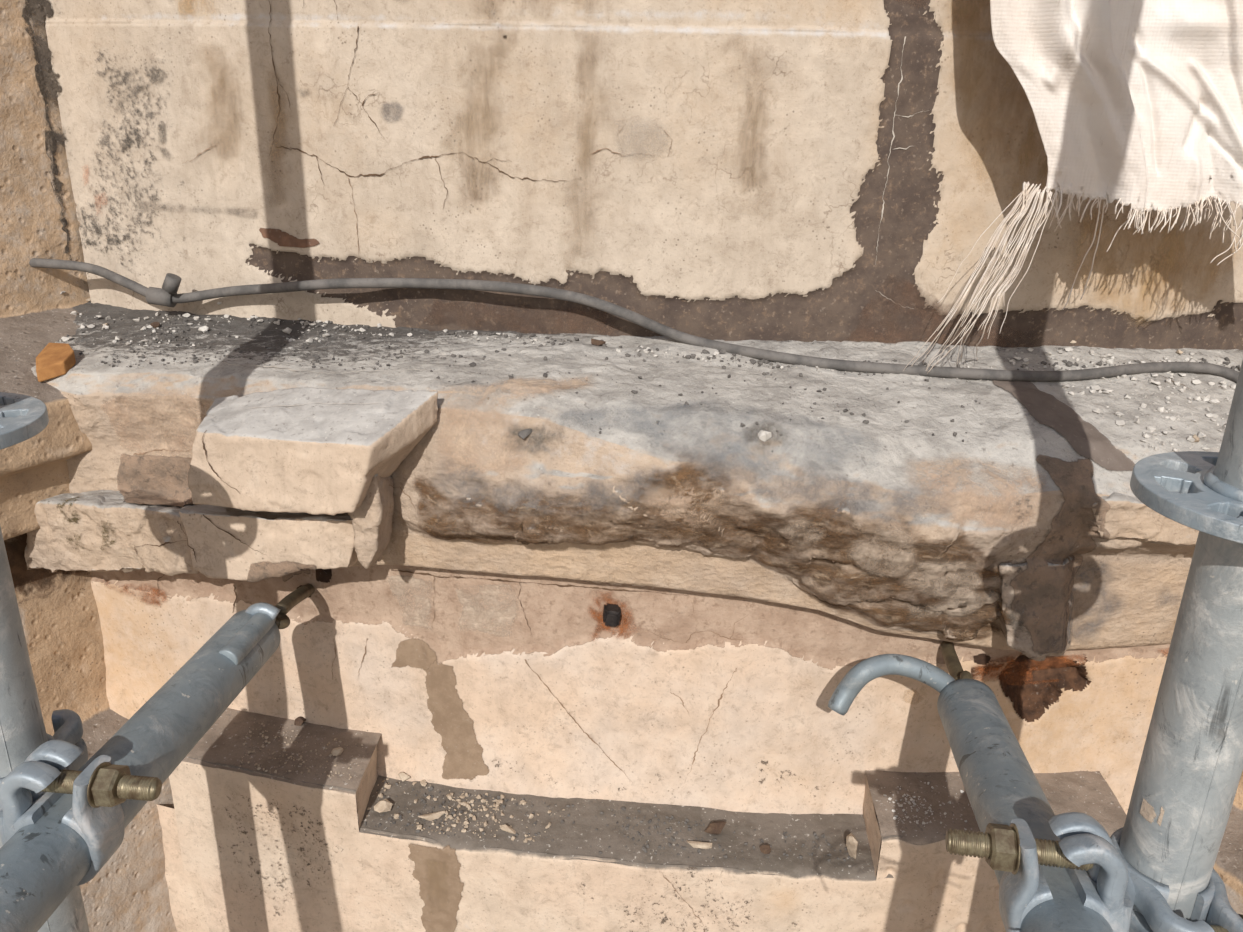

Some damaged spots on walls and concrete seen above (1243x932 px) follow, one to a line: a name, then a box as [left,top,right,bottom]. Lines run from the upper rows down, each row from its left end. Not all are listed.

leakage [83,52,165,265]
crack [268,0,672,252]
spalling [245,0,1243,350]
crack [876,37,925,259]
crack [134,514,265,599]
leakage [392,638,517,780]
crack [391,569,749,782]
rust [591,598,631,635]
peeling [374,799,392,813]
peeling [418,811,446,821]
leakage [408,844,464,932]
peeling [686,821,726,849]